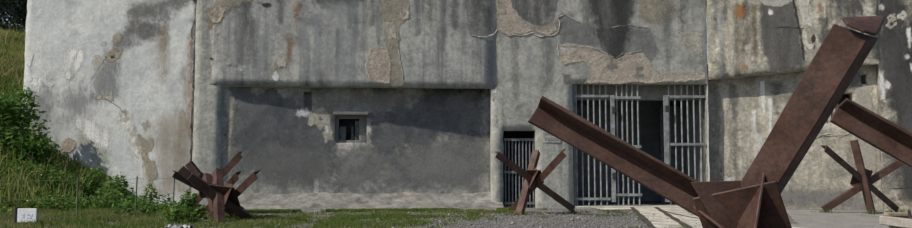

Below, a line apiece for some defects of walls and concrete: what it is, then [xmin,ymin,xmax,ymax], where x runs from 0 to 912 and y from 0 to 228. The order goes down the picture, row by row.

water stain [113,0,189,48]
spalling [365,0,410,86]
spalling [464,0,706,84]
water stain [583,0,634,59]
water stain [707,0,803,75]
peeling [827,15,846,31]
water stain [819,0,912,133]
spalling [885,10,912,48]
peeling [225,58,334,162]
peeling [715,82,739,181]
water stain [752,81,782,155]
water stain [890,157,912,199]